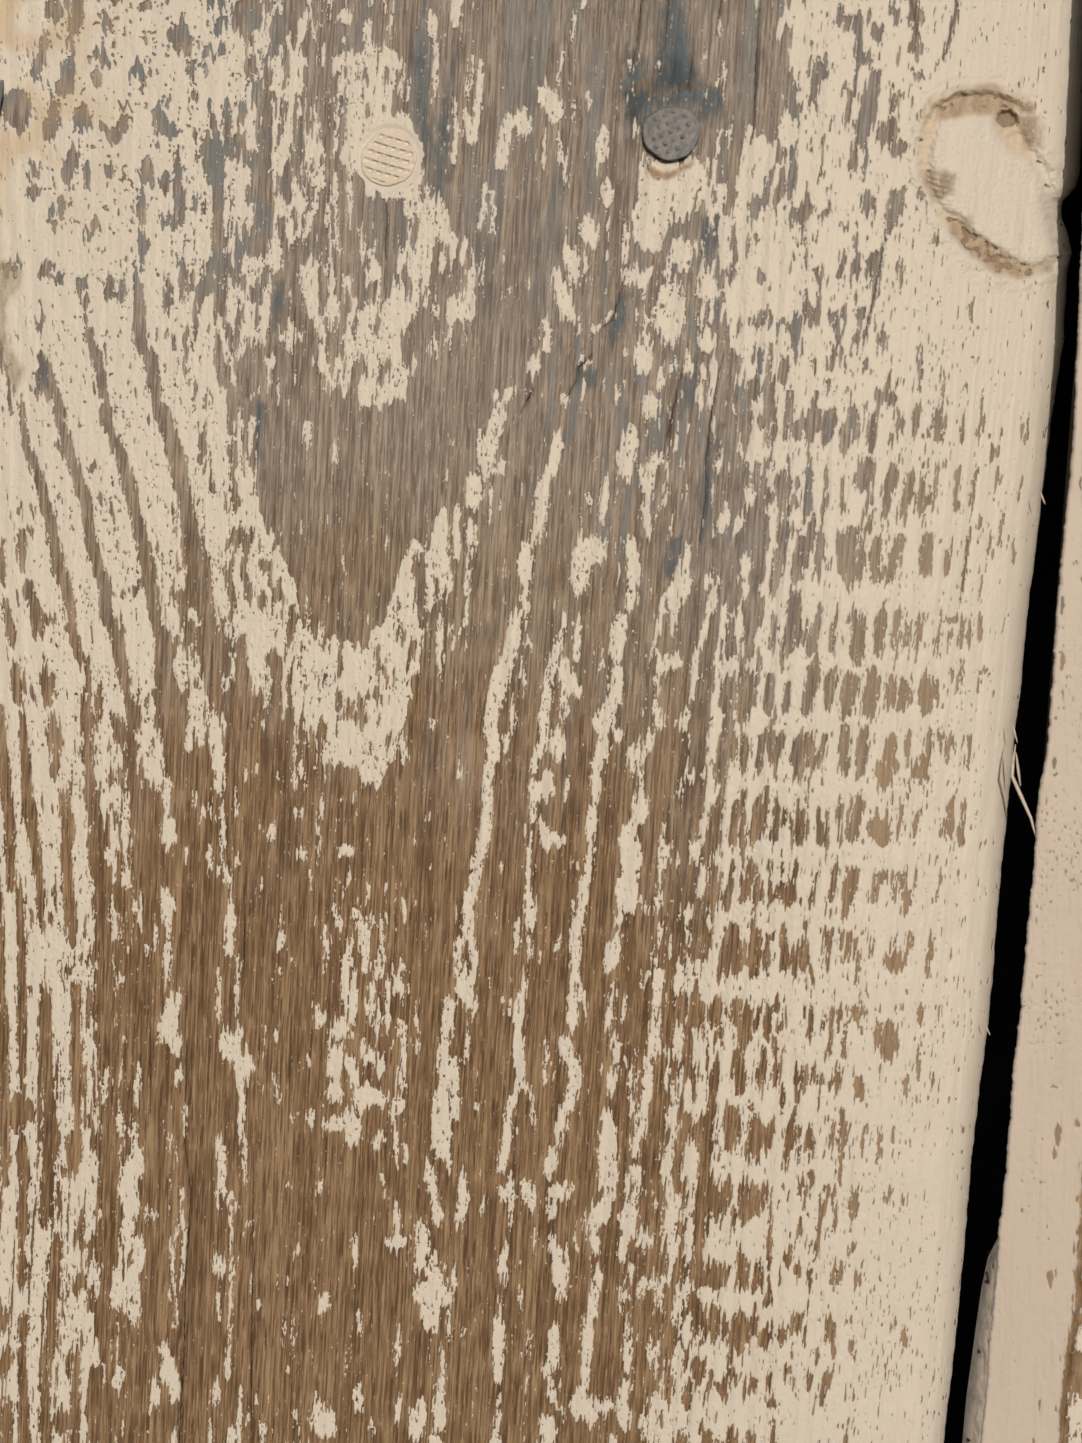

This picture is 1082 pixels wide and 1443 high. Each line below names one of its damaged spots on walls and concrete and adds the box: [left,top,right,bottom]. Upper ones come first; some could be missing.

peeling [913,187,943,266]
peeling [755,267,780,291]
peeling [953,289,983,351]
peeling [943,387,1023,603]
peeling [922,779,981,909]
peeling [876,930,914,988]
peeling [920,915,975,998]
peeling [894,997,974,1115]
peeling [1041,1118,1080,1161]
peeling [878,1184,925,1234]
peeling [1038,1163,1082,1443]
peeling [837,1274,945,1443]